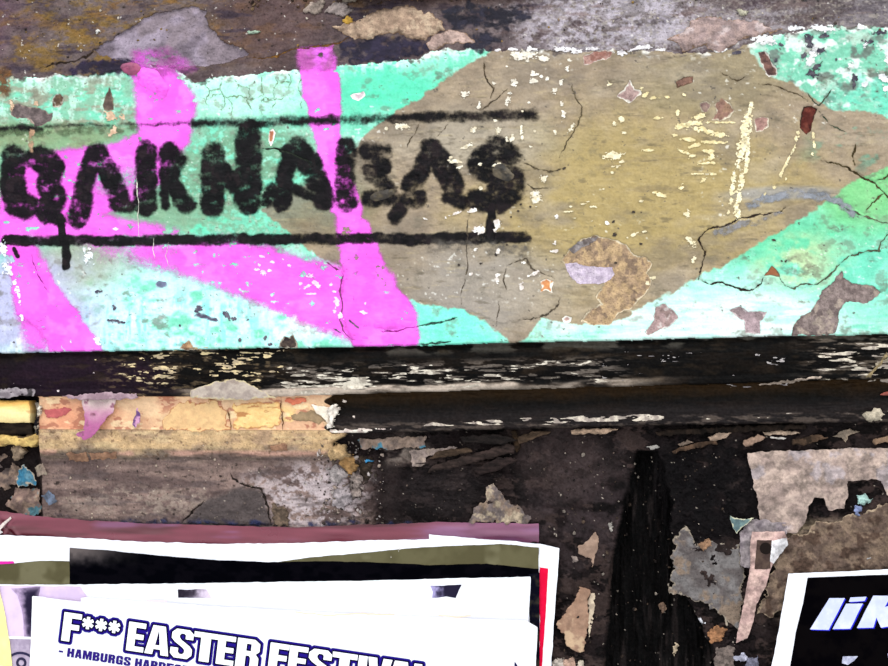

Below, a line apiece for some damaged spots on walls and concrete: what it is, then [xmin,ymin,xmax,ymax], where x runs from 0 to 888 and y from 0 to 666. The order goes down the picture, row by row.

spalling [96,6,249,67]
spalling [495,16,840,135]
spalling [471,175,547,235]
crack [697,72,888,291]
spalling [550,220,656,325]
spalling [645,304,678,335]
spalling [730,306,767,334]
spalling [792,271,881,336]
peeling [0,335,560,440]
spalling [817,343,888,383]
spalling [542,414,664,425]
peeling [578,532,599,566]